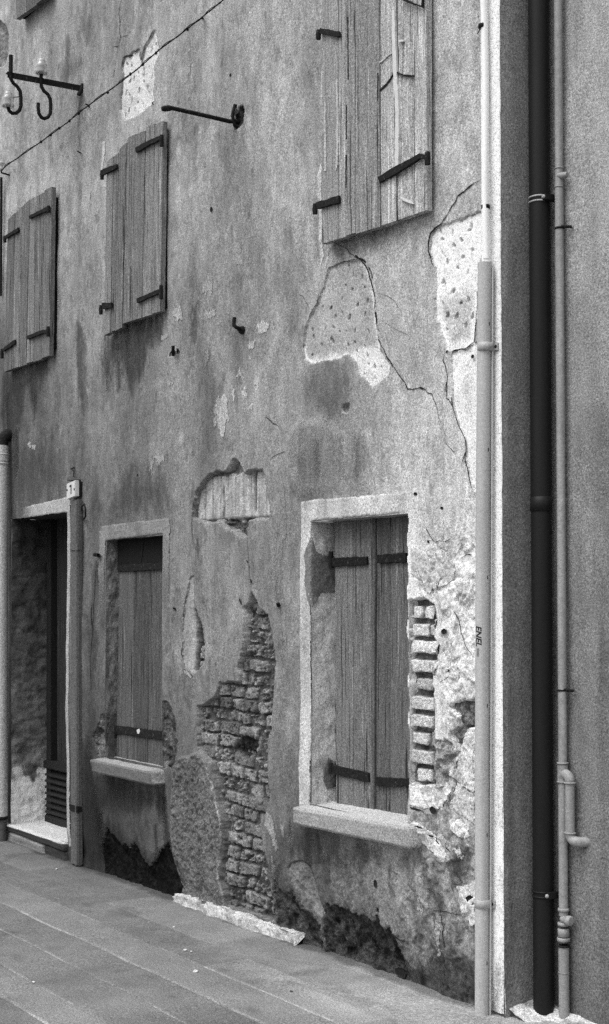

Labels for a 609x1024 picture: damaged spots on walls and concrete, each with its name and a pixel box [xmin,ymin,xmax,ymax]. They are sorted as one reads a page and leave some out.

spalling [122,31,159,119]
spalling [304,73,390,386]
crack [301,244,477,488]
crack [428,180,480,265]
spalling [431,213,482,488]
spalling [198,462,271,536]
water stain [82,747,176,868]
spalling [183,576,206,678]
spalling [200,603,407,979]
spalling [409,540,476,864]